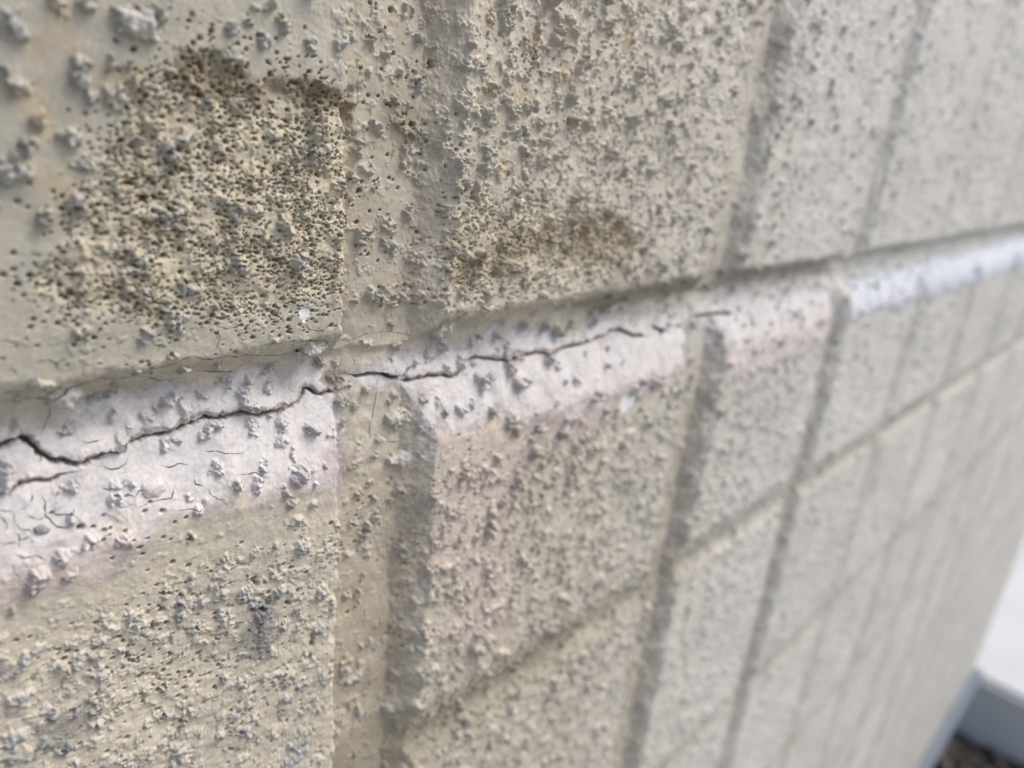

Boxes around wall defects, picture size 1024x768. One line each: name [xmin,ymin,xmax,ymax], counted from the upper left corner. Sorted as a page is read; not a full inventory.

spalling [34,51,359,326]
crack [0,310,731,577]